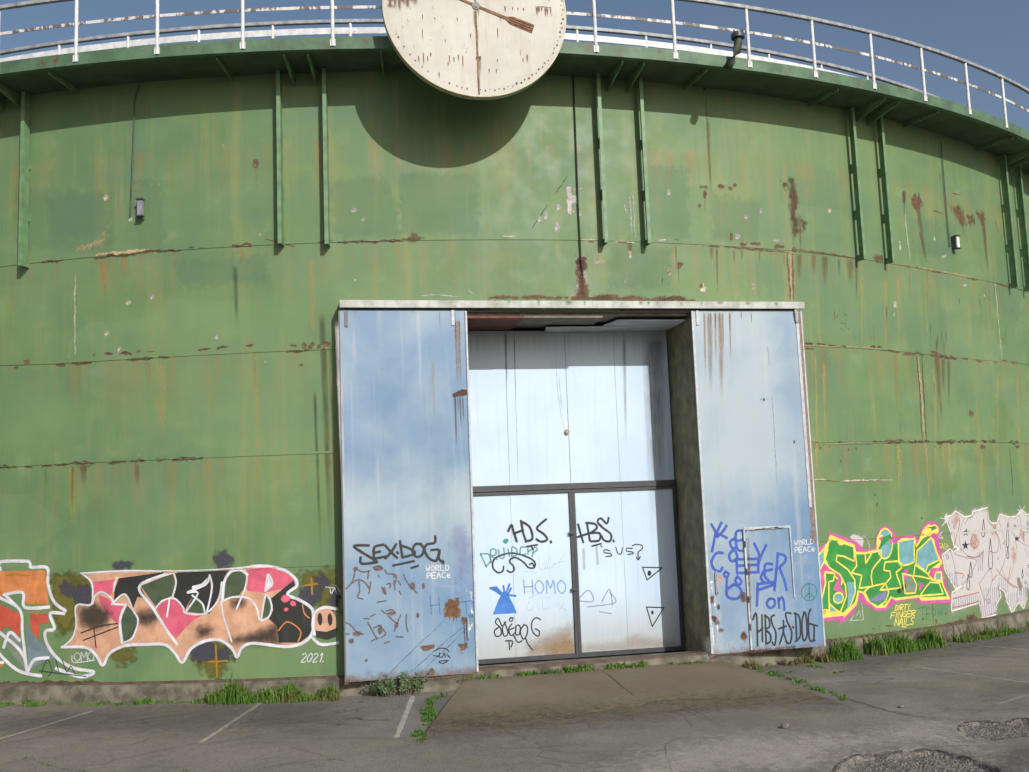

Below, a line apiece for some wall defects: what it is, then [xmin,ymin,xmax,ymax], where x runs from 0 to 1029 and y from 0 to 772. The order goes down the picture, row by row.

corrosion [485,0,564,92]
peeling [538,186,583,231]
corrosion [783,178,806,236]
corrosion [902,191,922,224]
corrosion [953,193,999,259]
corrosion [94,246,204,284]
corrosion [489,256,695,301]
corrosion [56,350,169,367]
corrosion [287,342,330,366]
corrosion [676,233,1029,543]
corrosion [0,461,94,471]
corrosion [443,598,468,651]